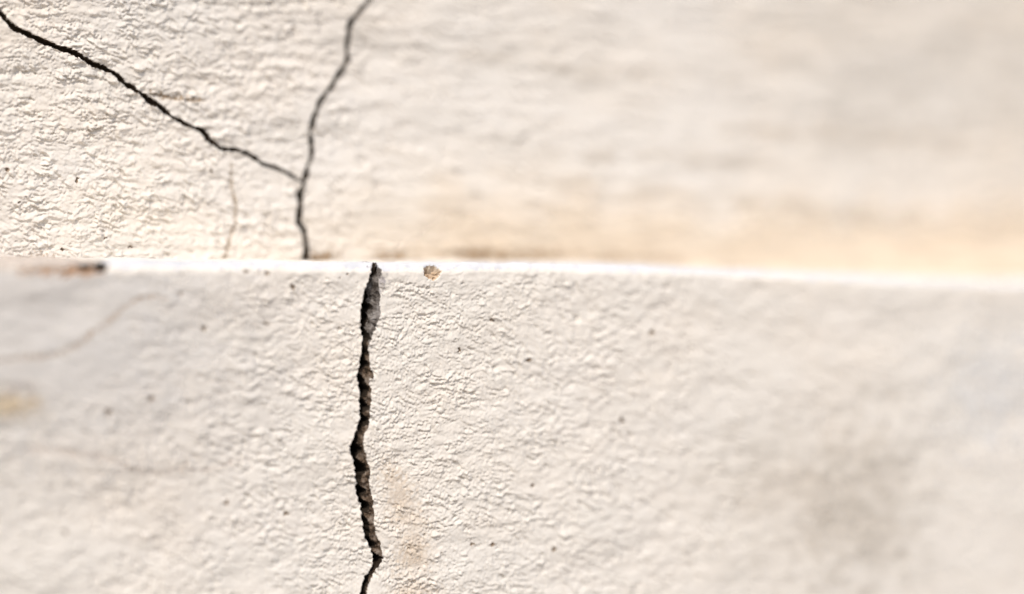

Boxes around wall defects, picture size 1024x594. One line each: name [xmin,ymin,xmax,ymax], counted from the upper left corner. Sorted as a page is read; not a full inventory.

crack [0,0,372,260]
crack [349,262,383,594]